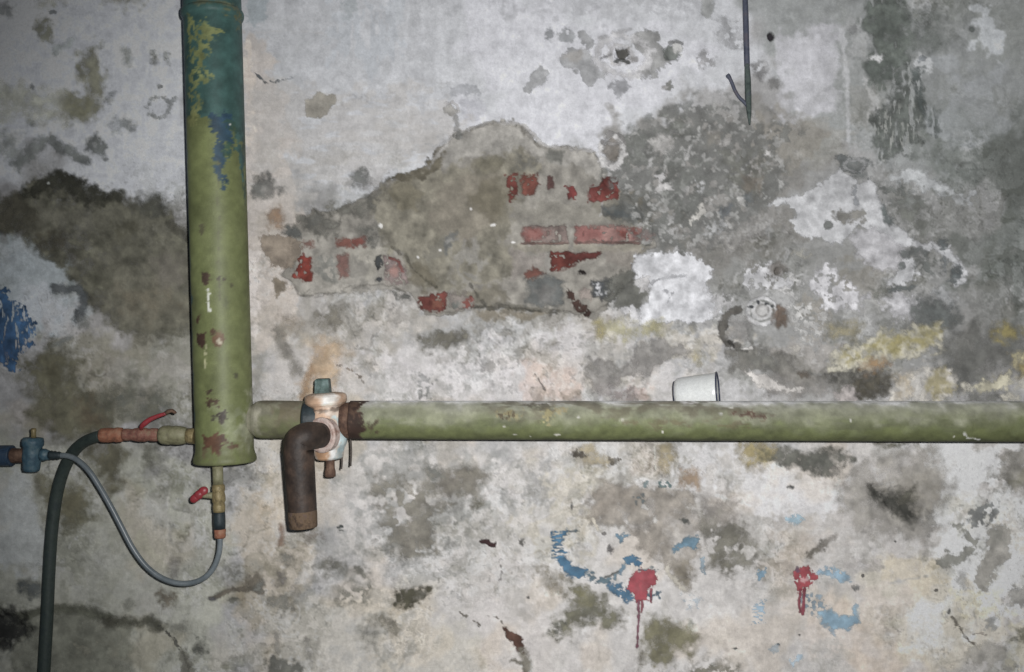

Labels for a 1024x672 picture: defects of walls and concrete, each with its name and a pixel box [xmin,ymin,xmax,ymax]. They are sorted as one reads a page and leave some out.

leakage [862,0,941,160]
leakage [0,170,192,344]
spalling [261,100,977,341]
leakage [879,186,962,285]
leakage [585,320,698,401]
leakage [724,282,1024,401]